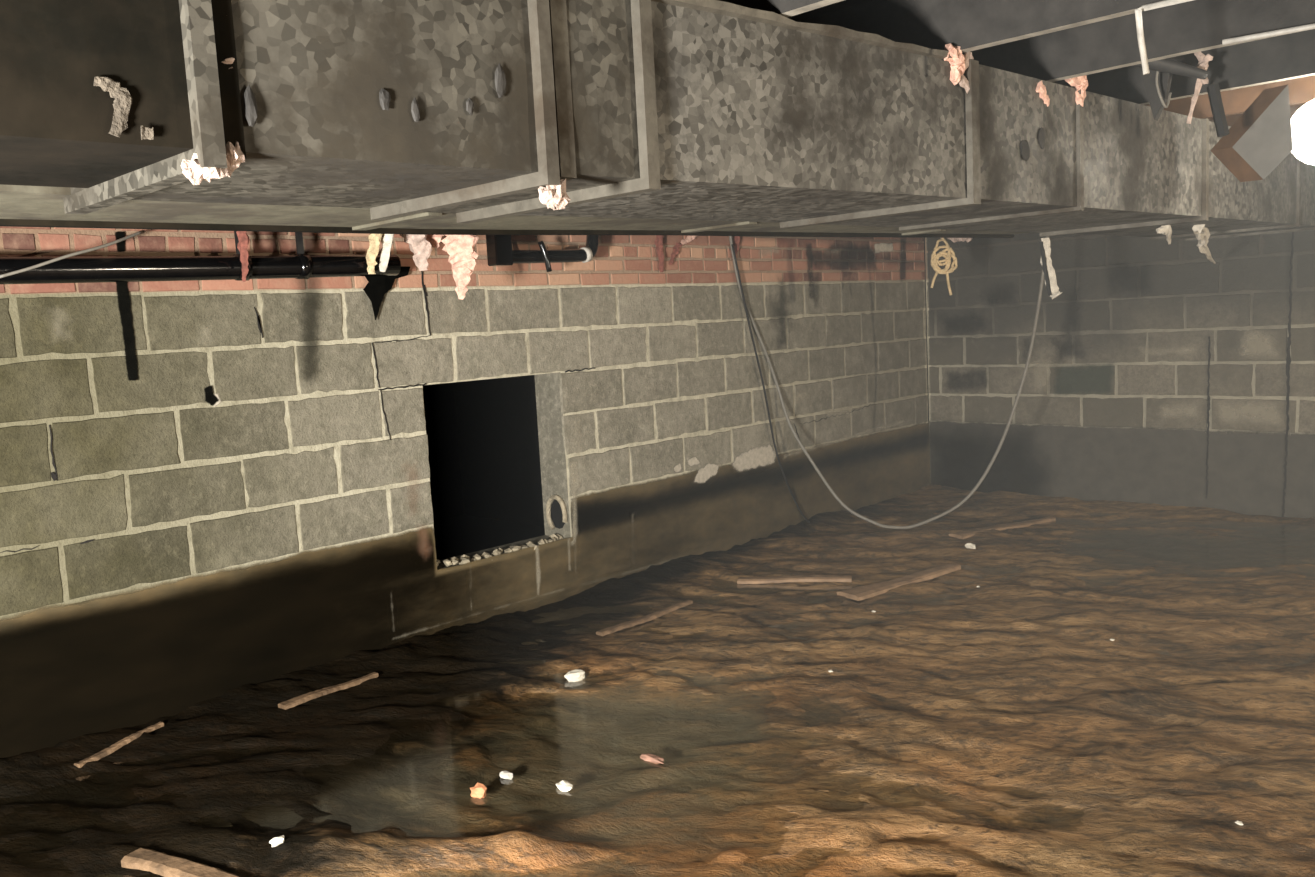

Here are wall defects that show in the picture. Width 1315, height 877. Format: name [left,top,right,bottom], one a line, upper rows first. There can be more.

crack [372,271,431,440]
crack [49,425,58,481]
water stain [0,421,1315,759]